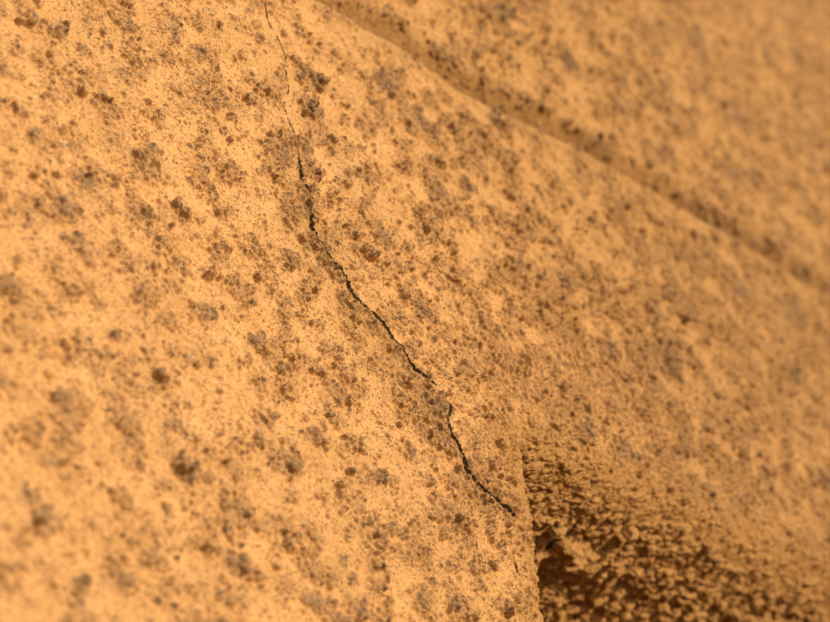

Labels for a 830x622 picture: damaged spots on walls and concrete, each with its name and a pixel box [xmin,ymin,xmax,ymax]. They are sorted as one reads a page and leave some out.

crack [264,1,438,386]
crack [447,402,517,519]